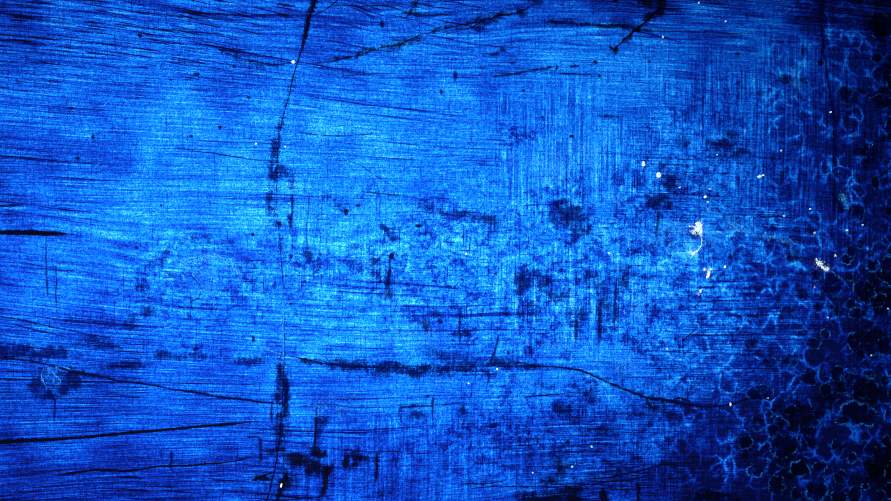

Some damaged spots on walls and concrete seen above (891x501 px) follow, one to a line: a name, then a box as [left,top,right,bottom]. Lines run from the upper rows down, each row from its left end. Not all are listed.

crack [609,3,665,50]
crack [276,0,315,281]
crack [0,336,753,501]